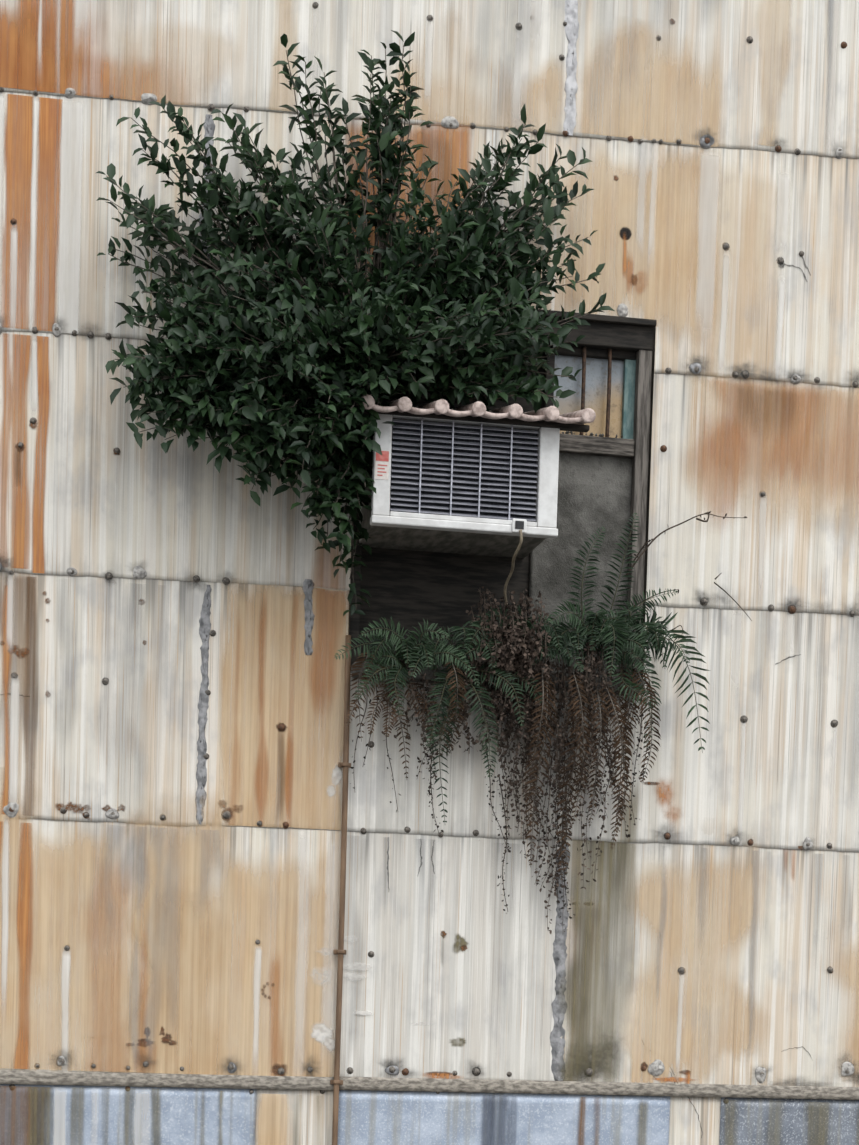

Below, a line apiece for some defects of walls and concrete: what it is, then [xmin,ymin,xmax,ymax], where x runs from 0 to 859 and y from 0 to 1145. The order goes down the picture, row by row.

rust [591,35,717,147]
rust [573,159,709,328]
rust [0,0,346,1077]
rust [0,1086,50,1145]